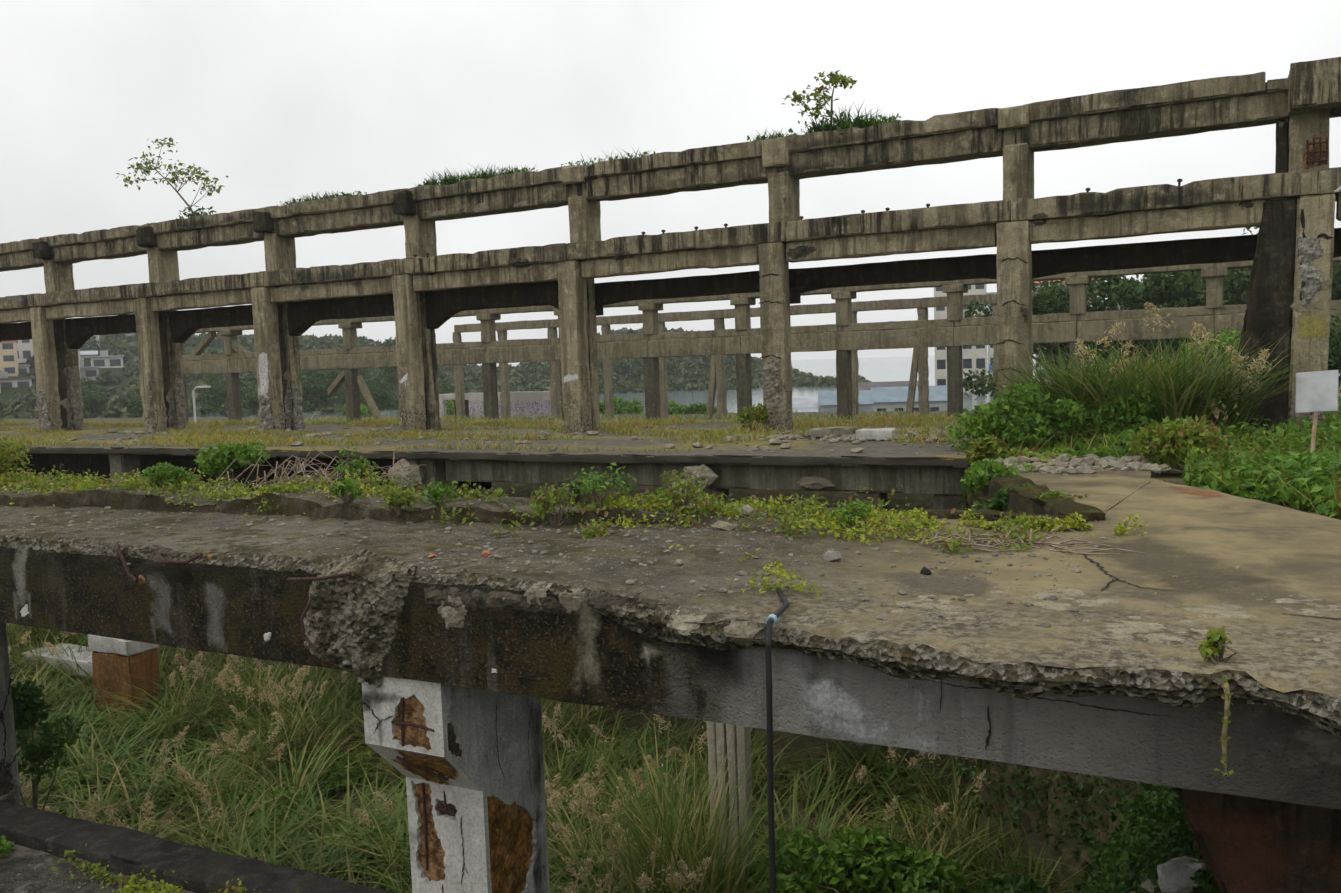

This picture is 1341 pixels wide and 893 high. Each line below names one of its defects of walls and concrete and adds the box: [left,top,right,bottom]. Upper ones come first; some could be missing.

spalling [1290,235,1331,313]
crack [1083,552,1180,592]
crack [871,667,991,749]
crack [1035,697,1169,716]